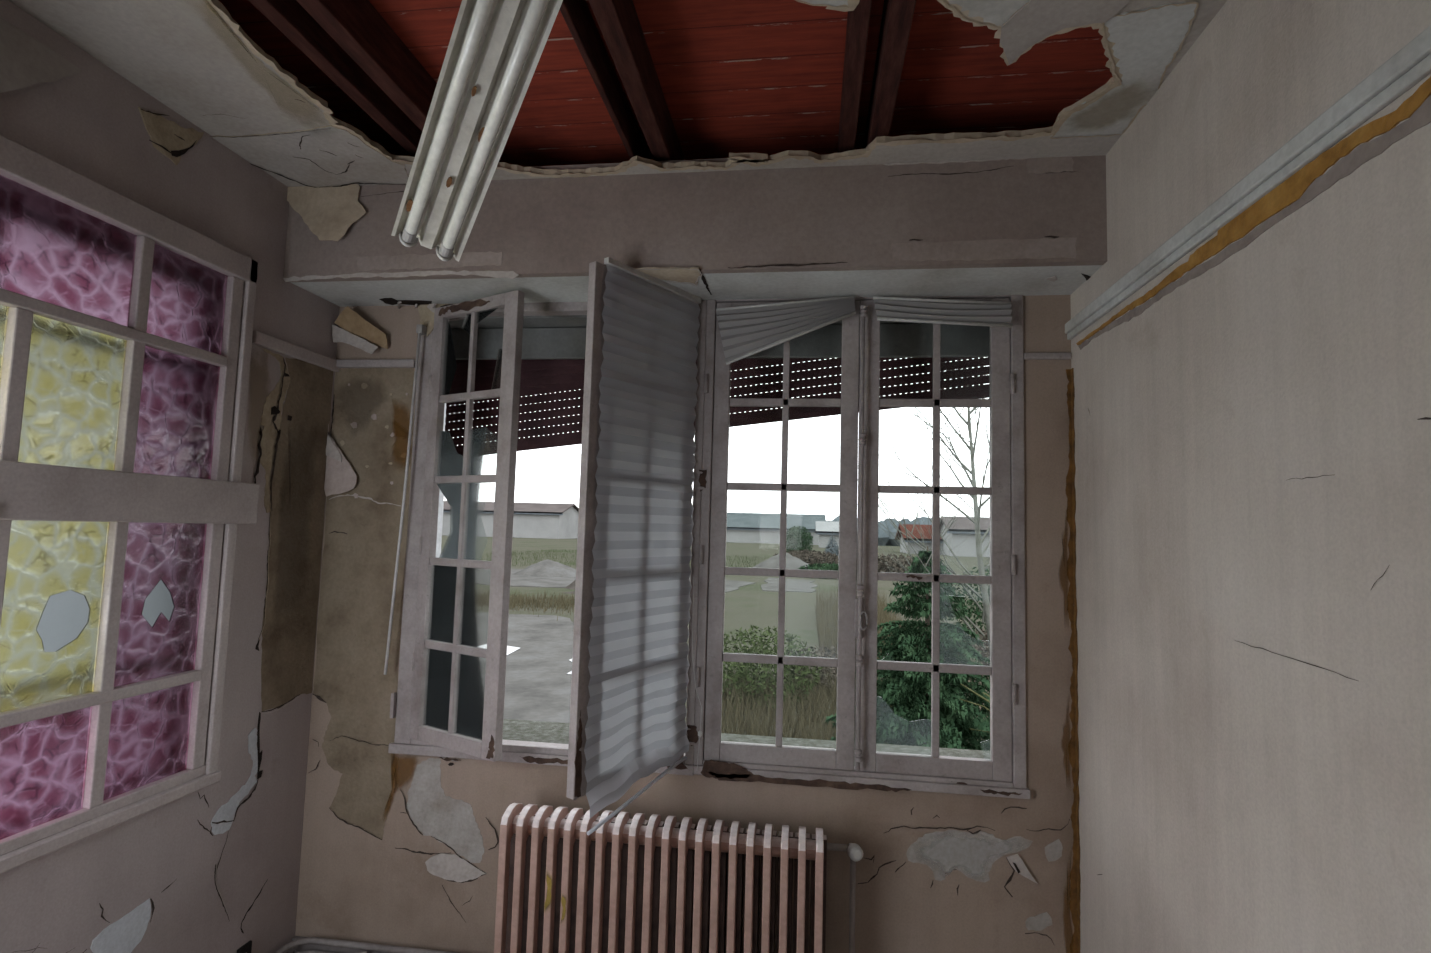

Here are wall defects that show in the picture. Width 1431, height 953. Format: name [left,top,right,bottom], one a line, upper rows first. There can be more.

flaking render [204,0,413,165]
flaking render [496,0,1199,178]
flaking render [198,306,499,883]
flaking render [83,884,171,953]
crack [214,835,268,933]
flaking render [884,826,1063,897]